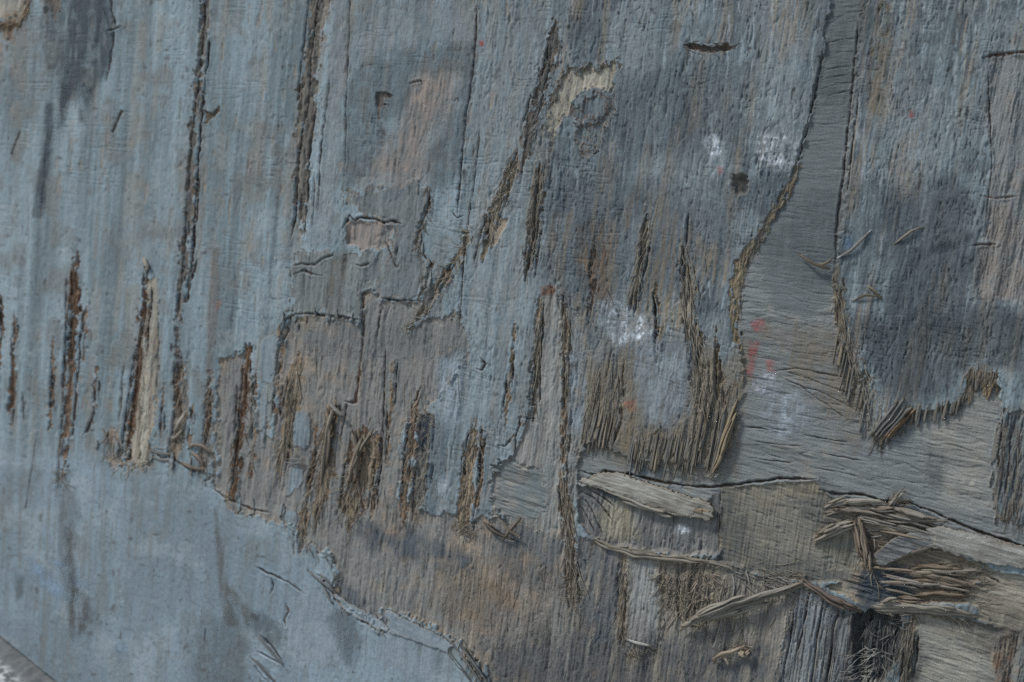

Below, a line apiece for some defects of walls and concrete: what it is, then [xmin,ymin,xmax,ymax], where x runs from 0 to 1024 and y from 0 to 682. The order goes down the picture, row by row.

spalling [543,55,622,159]
spalling [733,174,750,195]
crack [0,0,506,544]
peeling [101,276,190,482]
crack [461,228,1024,554]
peeling [595,500,640,544]
peeling [930,521,991,537]
spalling [826,559,915,606]
spalling [840,608,915,682]
peeling [901,561,1024,682]